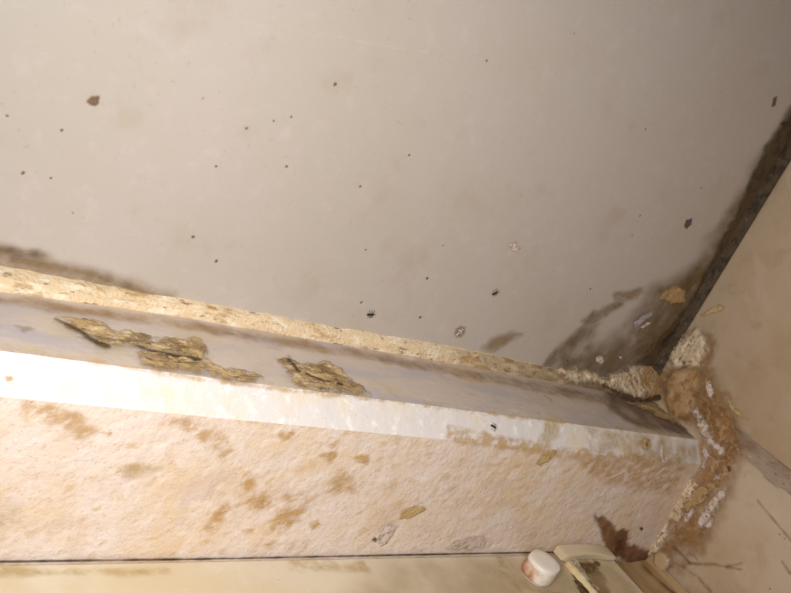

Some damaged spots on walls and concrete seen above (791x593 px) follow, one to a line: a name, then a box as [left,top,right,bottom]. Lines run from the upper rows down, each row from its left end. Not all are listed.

leakage [559,111,791,402]
peeling [55,316,261,383]
peeling [278,357,370,394]
leakage [273,509,303,530]
leakage [648,478,711,556]